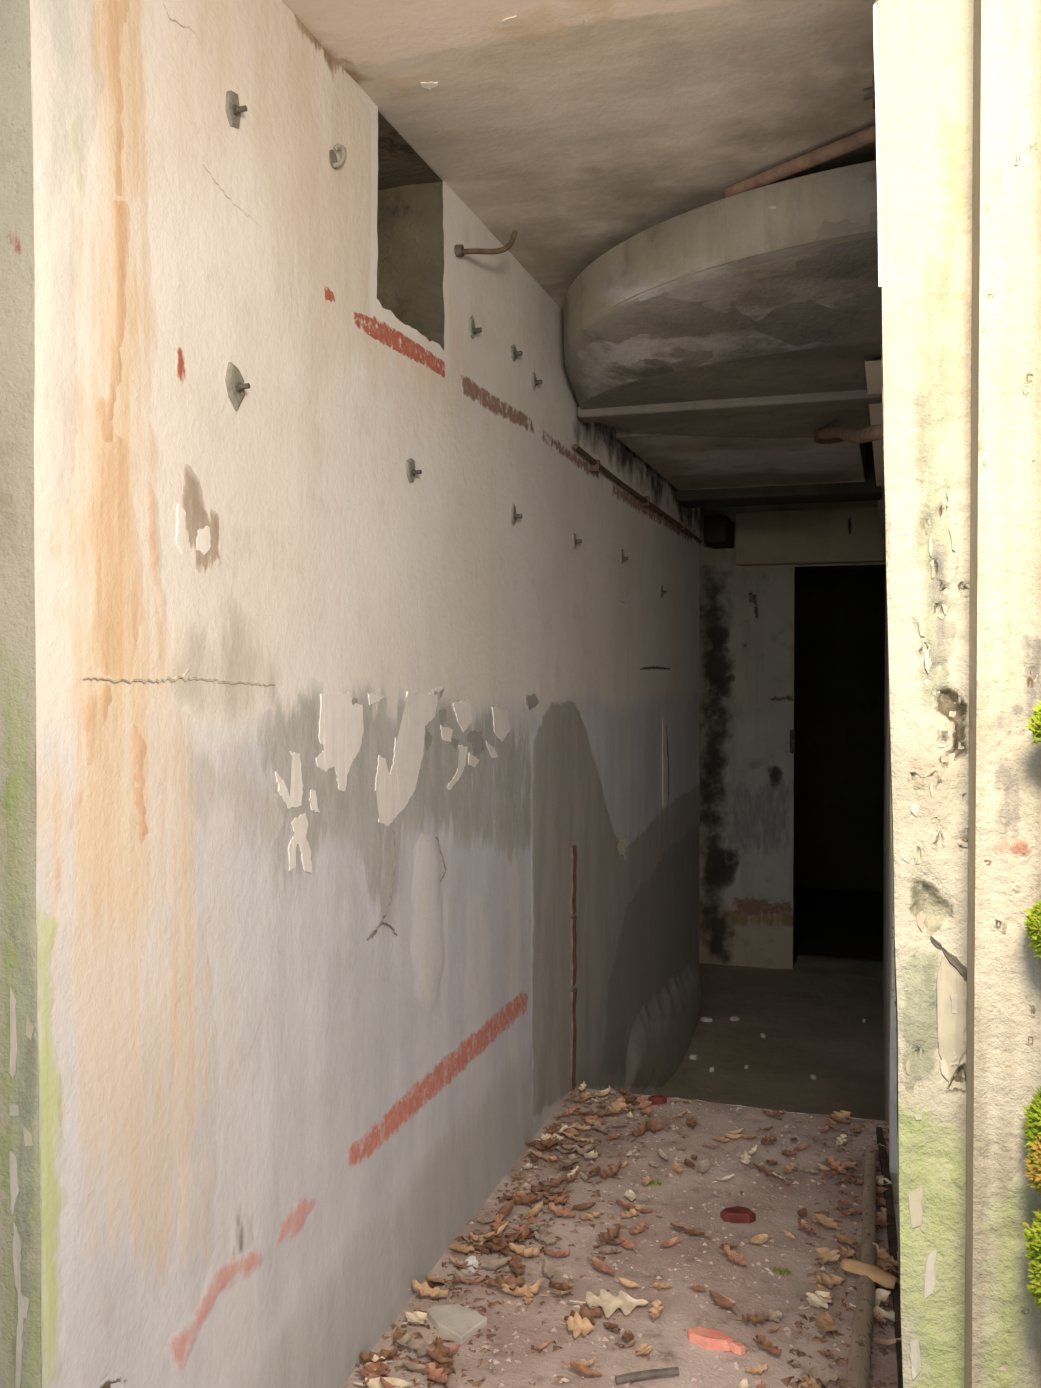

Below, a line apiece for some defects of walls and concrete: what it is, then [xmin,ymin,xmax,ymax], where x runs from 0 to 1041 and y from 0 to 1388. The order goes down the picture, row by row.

peeling [175,464,224,576]
corrosion [36,0,222,1298]
crack [83,669,275,686]
leakage [215,0,882,1388]
peeling [254,671,539,949]
peeling [890,488,992,1120]
peeling [908,1185,923,1229]
peeling [924,1249,937,1300]
peeling [910,1338,921,1380]